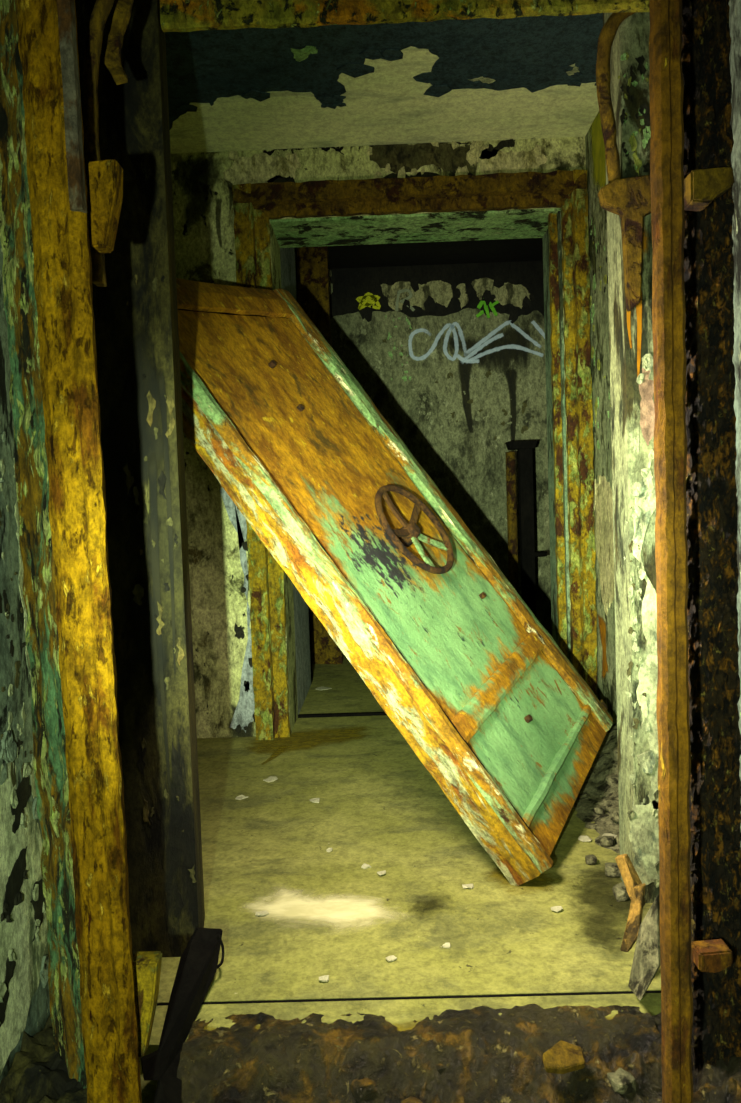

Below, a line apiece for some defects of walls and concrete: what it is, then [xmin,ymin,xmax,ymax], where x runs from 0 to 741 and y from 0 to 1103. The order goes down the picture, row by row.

peeling [170,46,599,185]
peeling [329,261,544,382]
damp [458,327,530,451]
peeling [0,458,15,491]
peeling [0,500,49,1076]